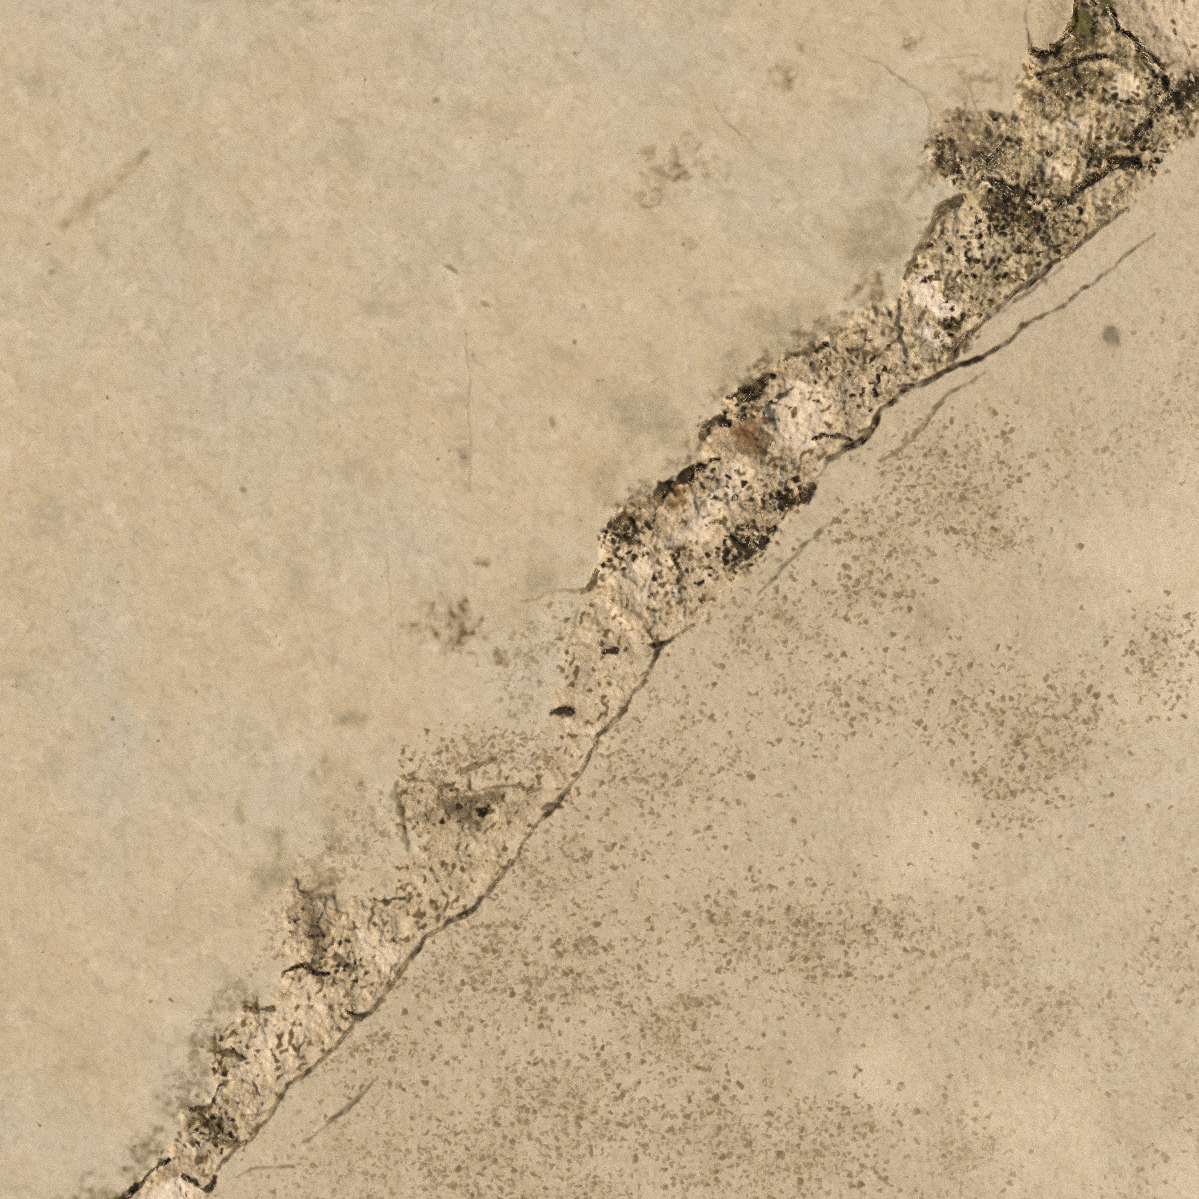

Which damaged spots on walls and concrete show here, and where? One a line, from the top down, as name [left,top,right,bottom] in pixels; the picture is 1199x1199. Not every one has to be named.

spalling [538,0,1199,806]
crack [825,207,1138,464]
spalling [108,759,548,1199]
crack [215,624,694,1172]